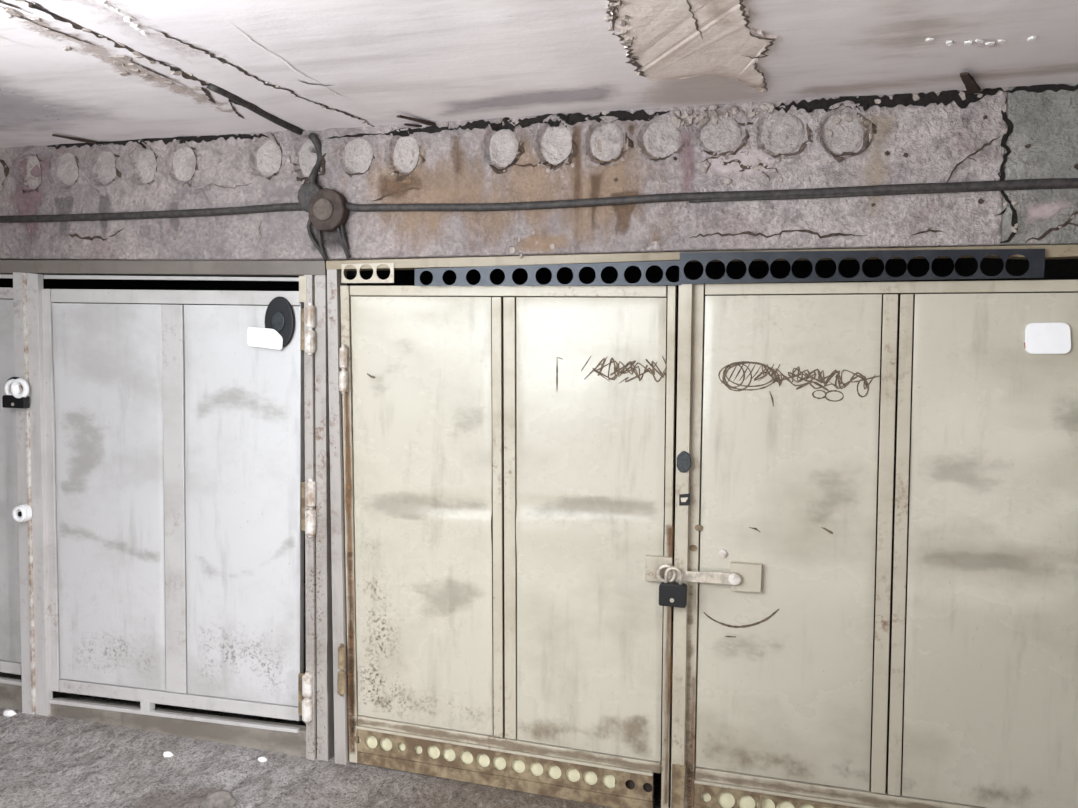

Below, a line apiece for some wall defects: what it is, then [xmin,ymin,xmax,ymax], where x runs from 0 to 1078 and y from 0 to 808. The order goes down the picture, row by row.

crack [0,0,670,149]
flaking render [604,0,777,128]
crack [501,161,575,169]
crack [700,122,783,183]
flaking render [699,143,785,185]
crack [775,84,1078,244]
crack [195,183,251,191]
crack [373,187,421,201]
flaking render [1029,203,1066,218]